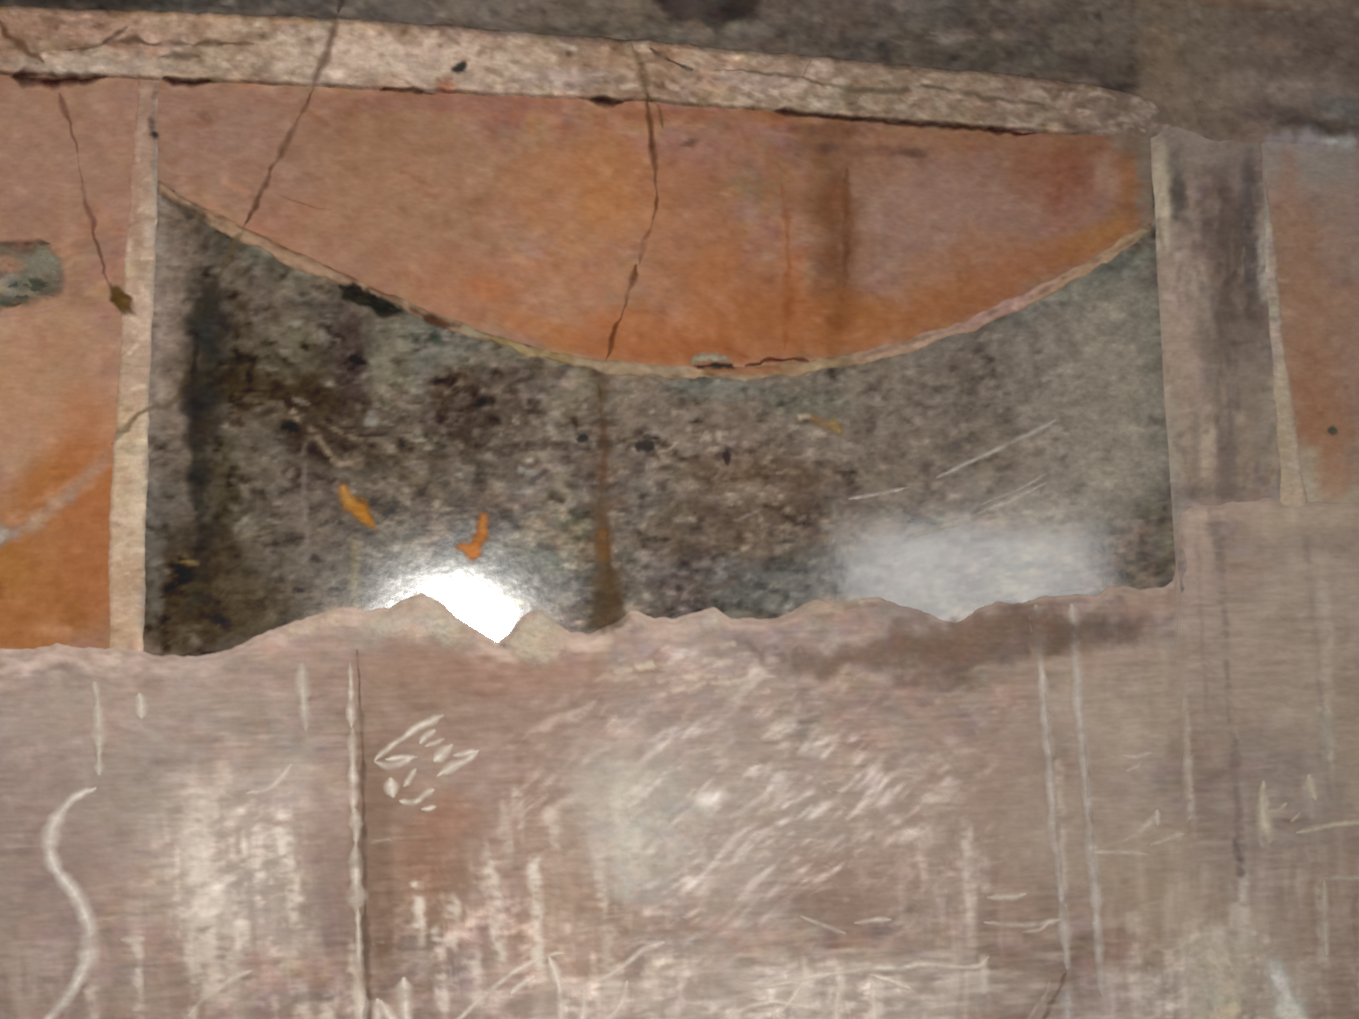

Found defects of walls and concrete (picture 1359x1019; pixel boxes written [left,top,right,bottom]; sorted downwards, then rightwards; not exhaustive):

crack [307,5,341,103]
crack [59,93,78,148]
crack [644,48,693,208]
crack [82,181,132,313]
crack [225,134,291,264]
crack [606,264,637,360]
crack [119,349,198,434]
rust [591,384,618,624]